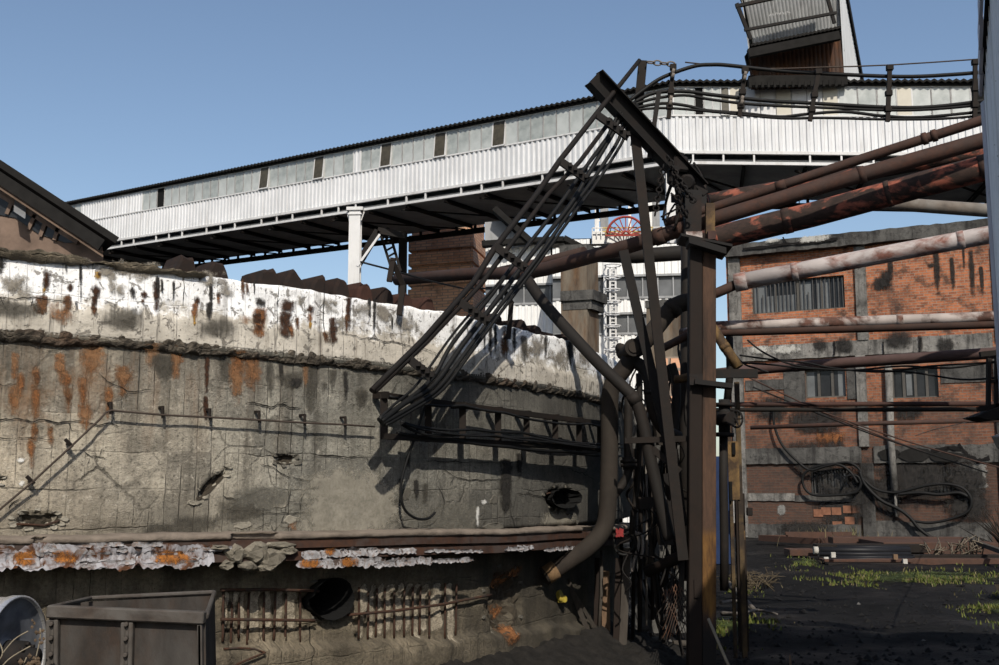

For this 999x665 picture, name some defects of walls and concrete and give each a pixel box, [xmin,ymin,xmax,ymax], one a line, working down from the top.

corrosion [33,269,50,314]
corrosion [91,272,101,315]
corrosion [241,280,267,337]
corrosion [278,299,314,337]
water stain [928,249,984,294]
crack [248,402,298,410]
crack [0,418,121,464]
spalling [187,465,233,506]
crack [256,453,311,531]
water stain [499,453,523,513]
spalling [7,508,69,531]
peeling [0,542,233,572]